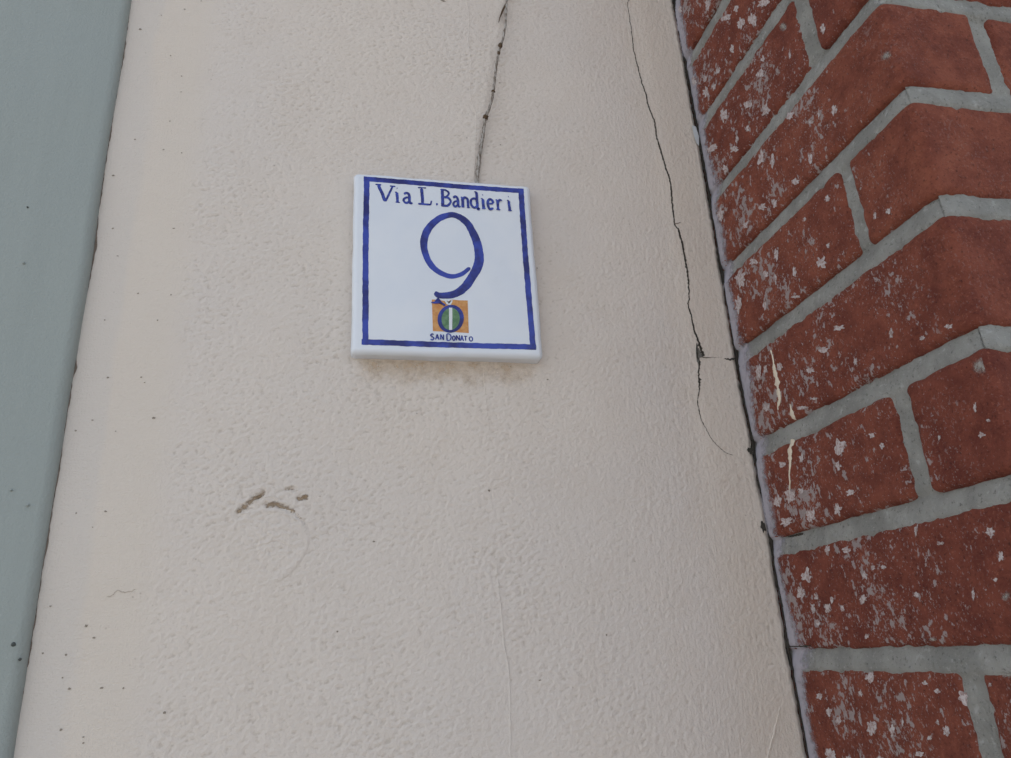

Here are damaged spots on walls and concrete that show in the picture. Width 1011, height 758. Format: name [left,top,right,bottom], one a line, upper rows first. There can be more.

crack [627,0,811,758]
leakage [770,350,796,420]
spalling [237,489,308,520]